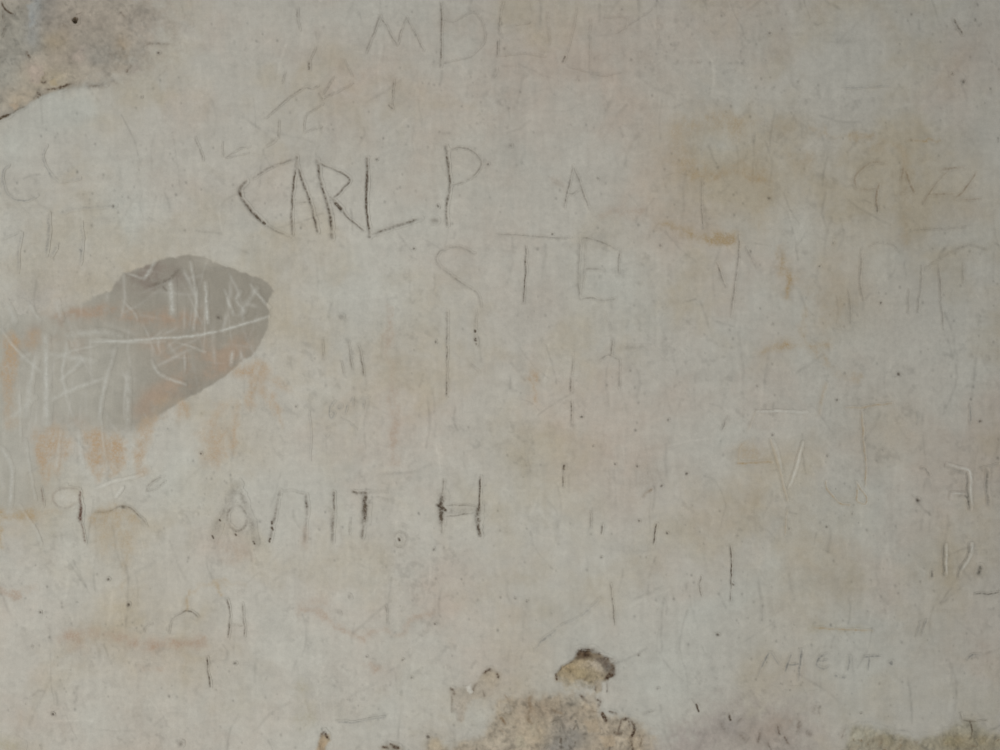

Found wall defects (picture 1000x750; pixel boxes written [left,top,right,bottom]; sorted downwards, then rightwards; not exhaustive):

flaking render [0,0,194,122]
peeling [419,644,1000,750]